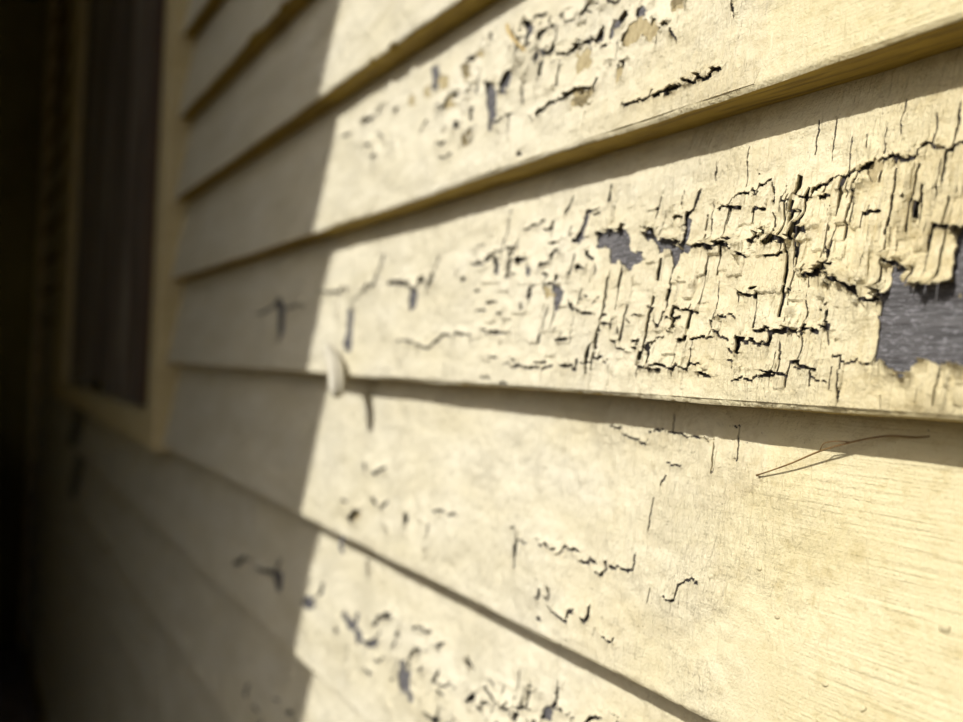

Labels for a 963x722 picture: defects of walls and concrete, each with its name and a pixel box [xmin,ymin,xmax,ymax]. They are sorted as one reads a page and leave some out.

peeling [330,0,771,194]
peeling [239,74,963,415]
peeling [221,439,712,722]
crack [498,398,770,676]